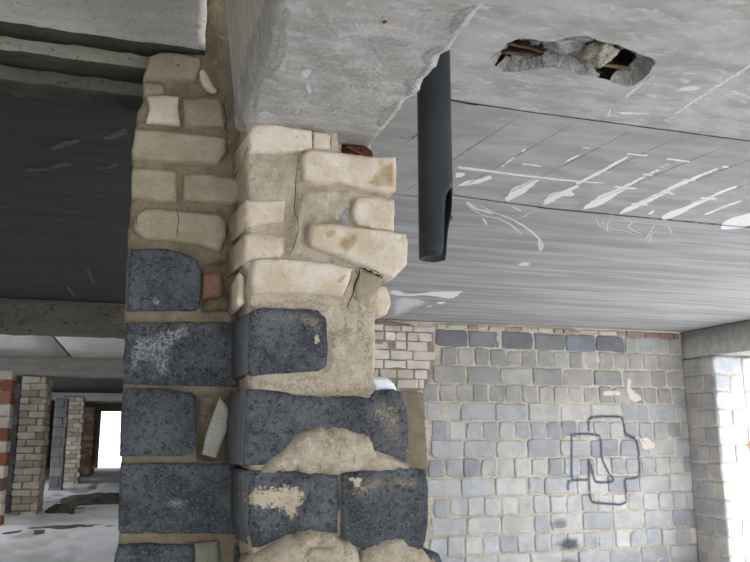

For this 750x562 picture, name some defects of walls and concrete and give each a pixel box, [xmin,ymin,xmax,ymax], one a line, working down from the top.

spalling [490,36,656,87]
rust [342,144,373,157]
crack [290,165,299,254]
crack [342,266,383,309]